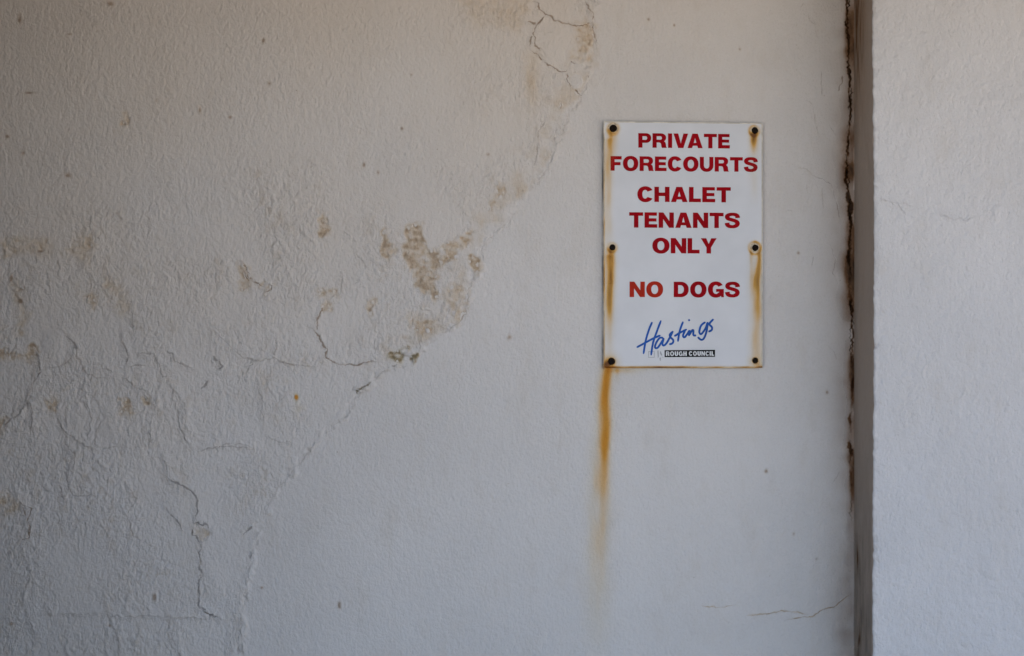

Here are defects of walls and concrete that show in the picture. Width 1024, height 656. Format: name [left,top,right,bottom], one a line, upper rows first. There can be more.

crack [844,0,854,494]